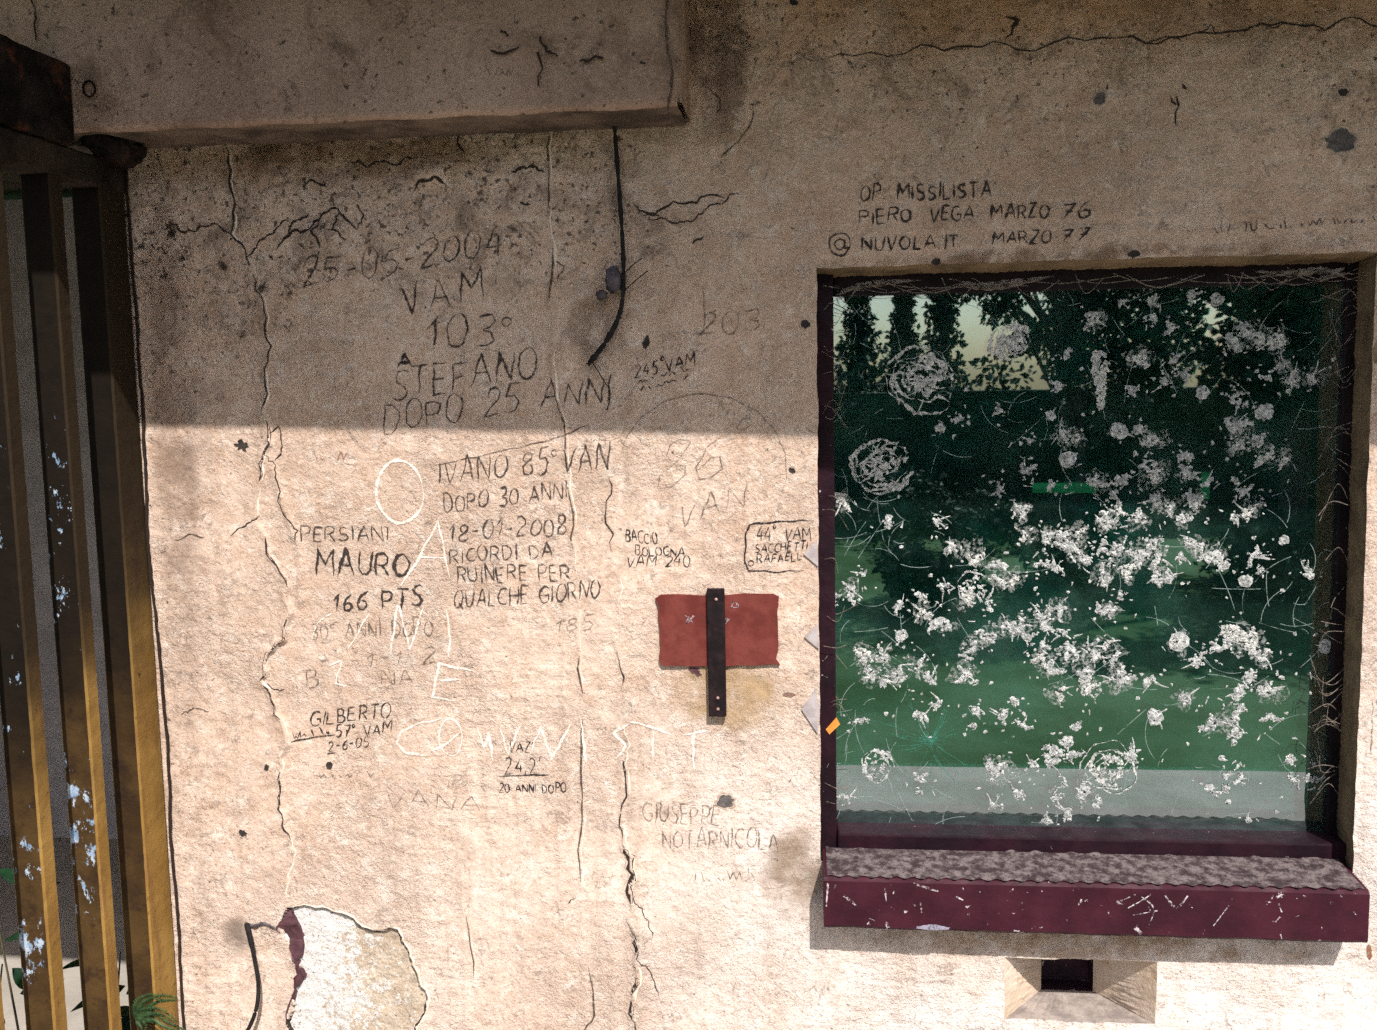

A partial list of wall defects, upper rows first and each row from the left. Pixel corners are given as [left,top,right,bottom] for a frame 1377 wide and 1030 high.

crack [801,17,1377,61]
crack [1170,84,1186,125]
crack [511,132,565,298]
crack [124,145,445,1029]
crack [432,351,623,904]
crack [619,727,659,1030]
spalling [275,904,431,1030]
crack [466,918,476,977]
crack [584,967,595,1030]